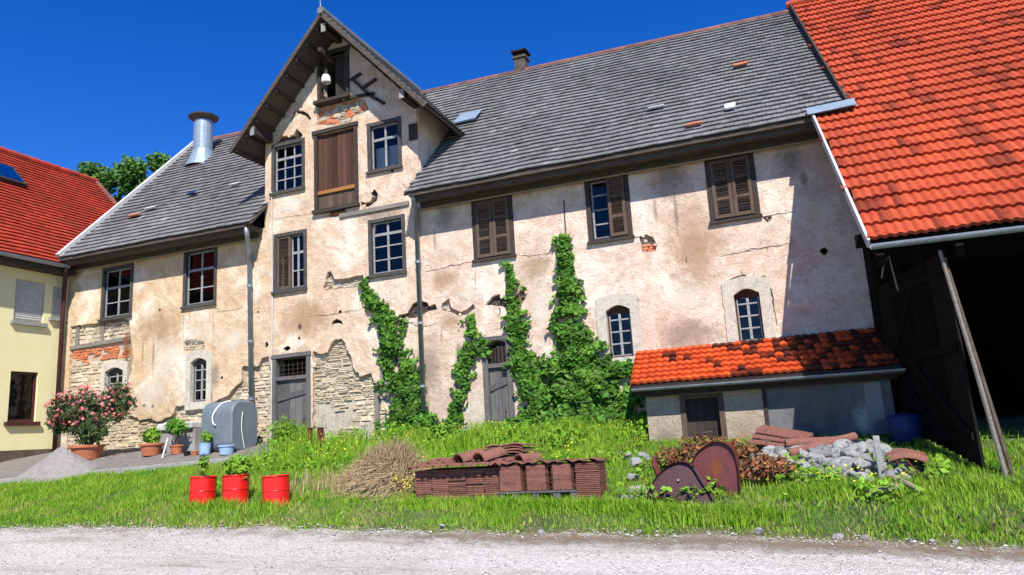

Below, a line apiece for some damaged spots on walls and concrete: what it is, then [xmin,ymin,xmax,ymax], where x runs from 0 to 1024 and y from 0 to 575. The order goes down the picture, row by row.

spalling [275,98,369,144]
flaking render [639,234,658,252]
spalling [324,271,364,290]
spalling [396,291,526,320]
crack [723,242,795,325]
spalling [68,319,131,404]
spalling [215,356,271,443]
spalling [311,338,398,441]
spalling [67,405,203,450]